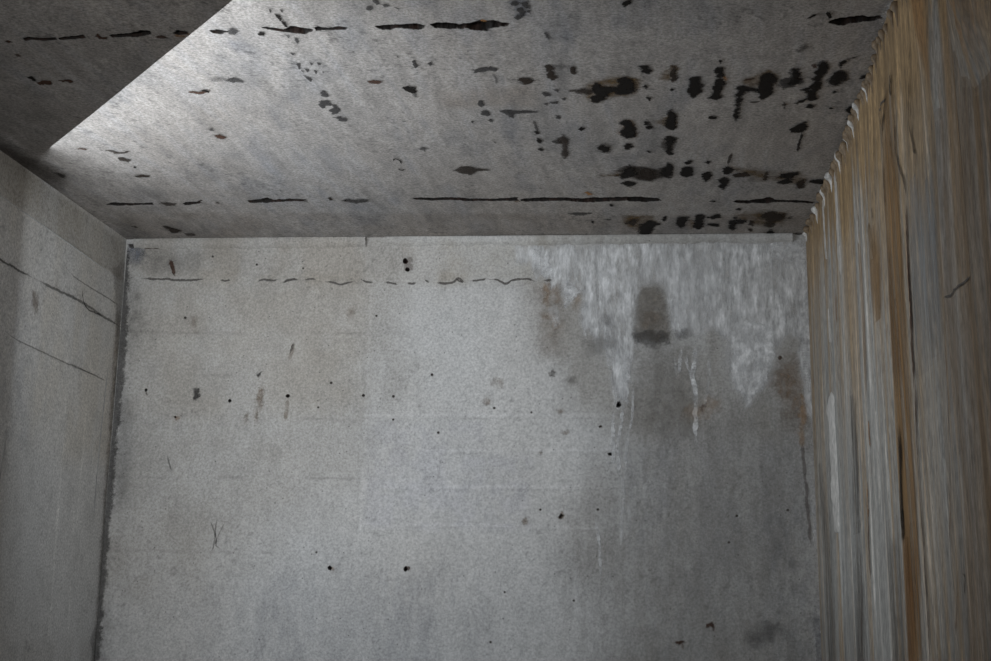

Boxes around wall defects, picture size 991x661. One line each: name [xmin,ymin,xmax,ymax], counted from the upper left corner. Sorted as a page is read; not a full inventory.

spalling [808,12,884,27]
spalling [728,196,817,211]
leakage [516,0,907,470]
crack [0,258,28,275]
crack [144,276,230,284]
crack [259,277,551,285]